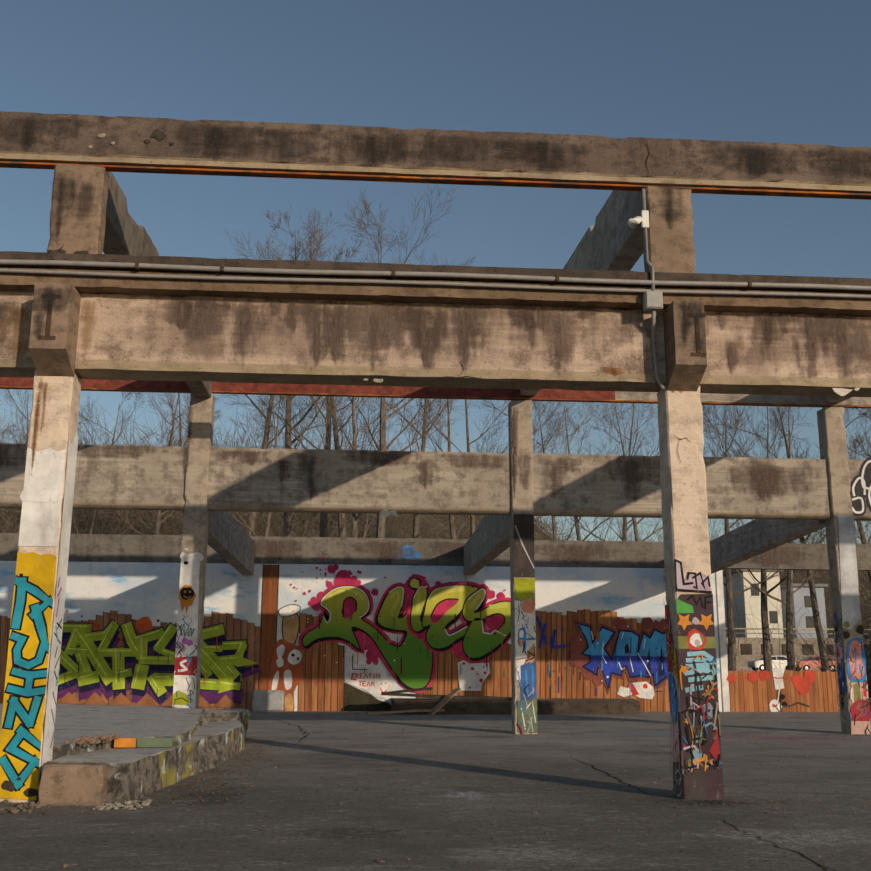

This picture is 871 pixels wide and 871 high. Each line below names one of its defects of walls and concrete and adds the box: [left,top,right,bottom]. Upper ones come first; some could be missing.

damp [168,299,487,367]
damp [510,308,572,367]
rust [32,383,47,467]
damp [351,451,411,466]
damp [418,461,433,487]
damp [442,411,529,489]
damp [730,461,818,500]